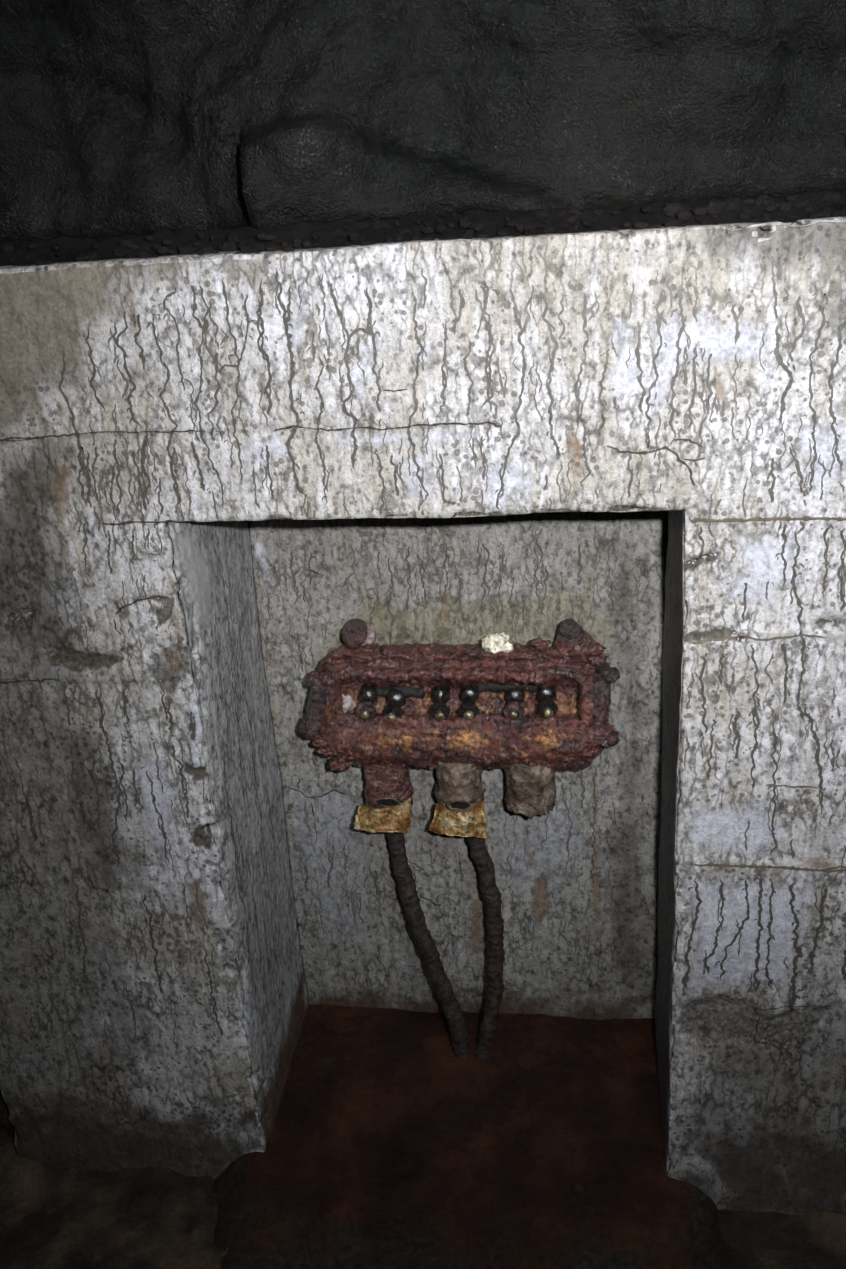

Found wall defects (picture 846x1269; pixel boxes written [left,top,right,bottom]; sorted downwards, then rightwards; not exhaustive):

crack [0,429,201,442]
crack [276,421,500,431]
crack [607,428,704,486]
crack [103,520,173,555]
crack [692,516,846,534]
crack [114,596,164,635]
crack [691,619,832,644]
damp [0,221,846,1163]
crack [292,779,346,814]
crack [767,784,822,813]
crack [695,863,846,873]
crack [689,998,832,1059]